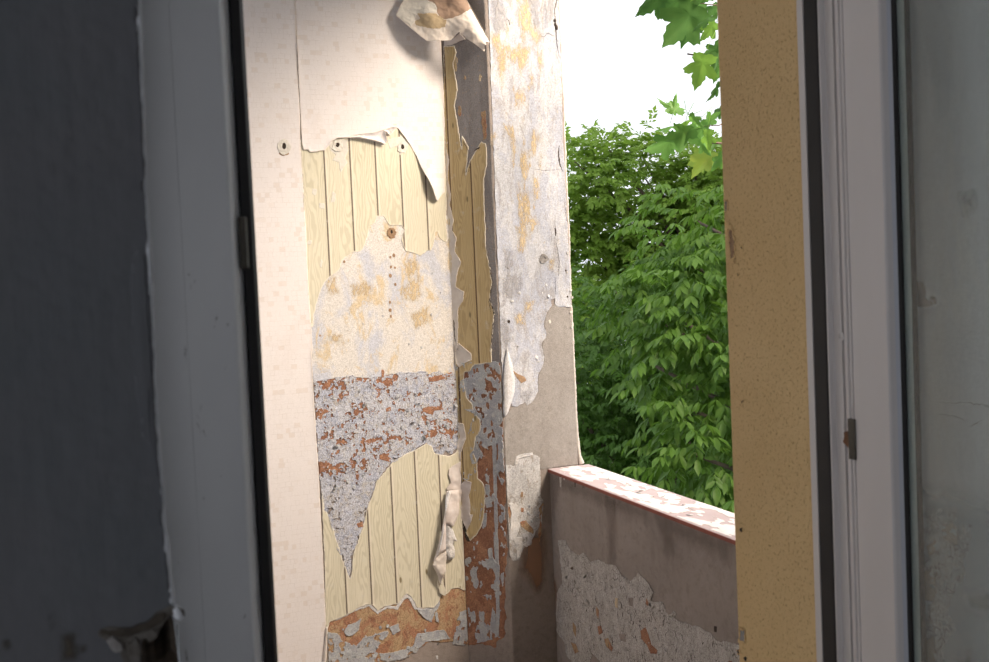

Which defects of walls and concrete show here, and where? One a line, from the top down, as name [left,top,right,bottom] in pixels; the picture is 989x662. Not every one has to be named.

hole [98,604,188,662]
peeling [311,0,747,662]